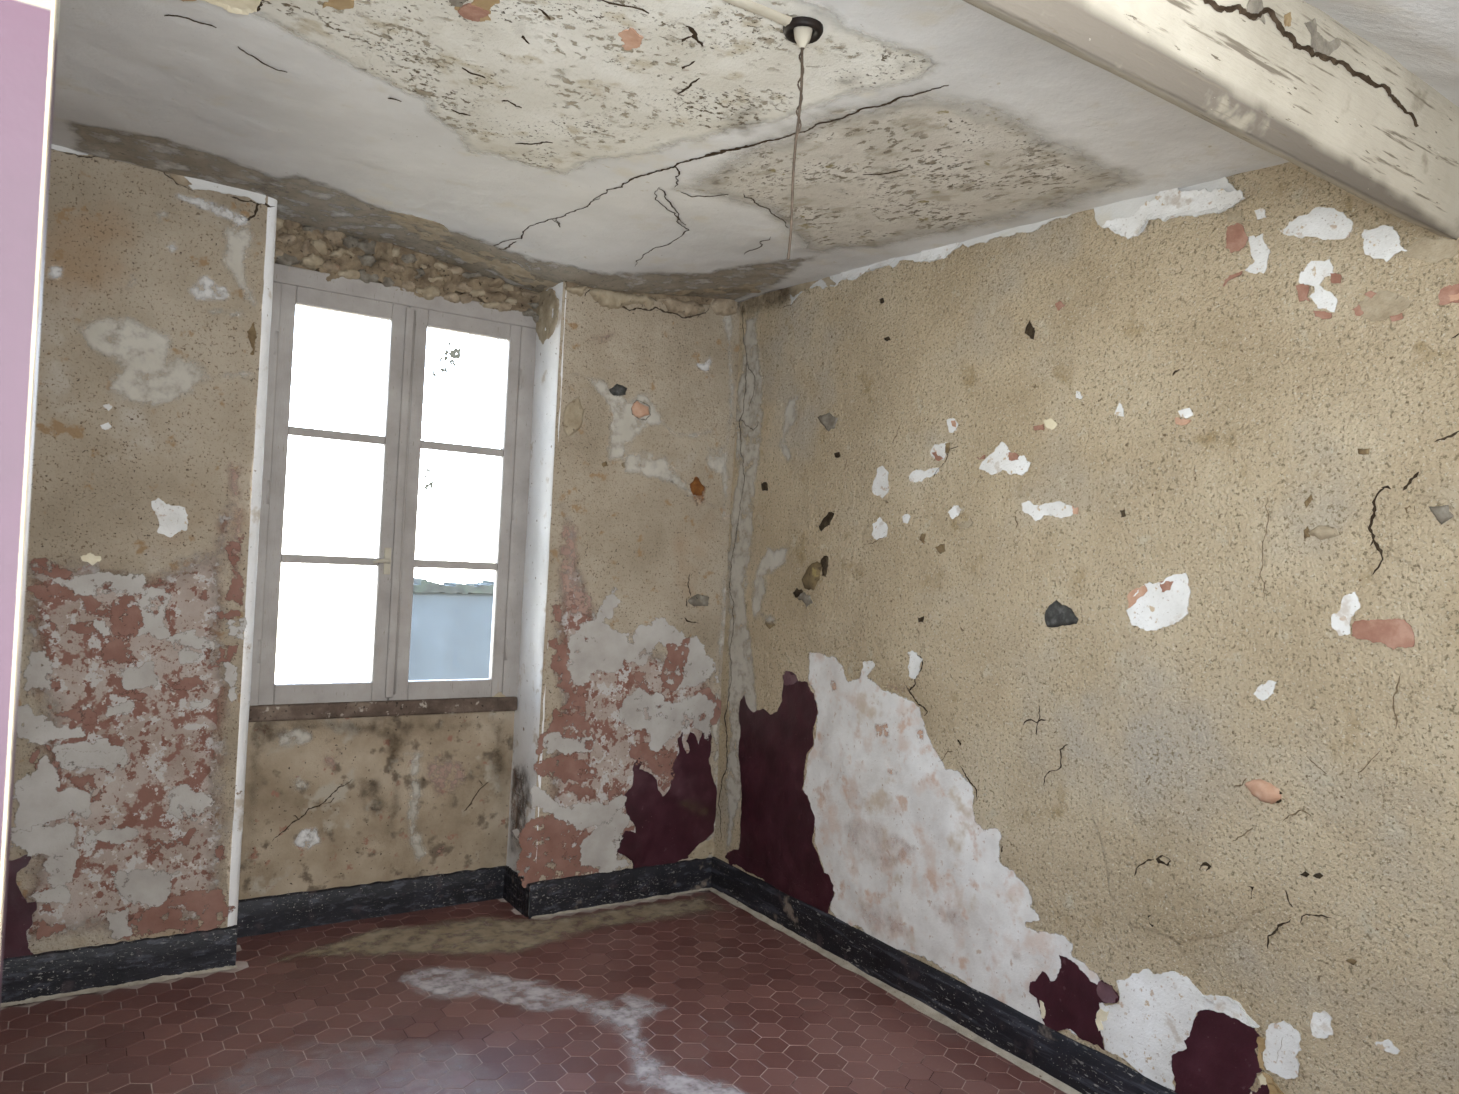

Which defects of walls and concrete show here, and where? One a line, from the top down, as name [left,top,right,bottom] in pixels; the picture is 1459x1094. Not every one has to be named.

peeling [51,144,92,155]
peeling [165,172,266,204]
crack [494,85,949,266]
peeling [181,0,1459,344]
crack [1203,0,1419,127]
water stain [72,123,804,858]
peeling [1331,592,1415,650]
peeling [3,469,247,959]
peeling [511,527,1333,1094]
peeling [1375,1039,1400,1054]